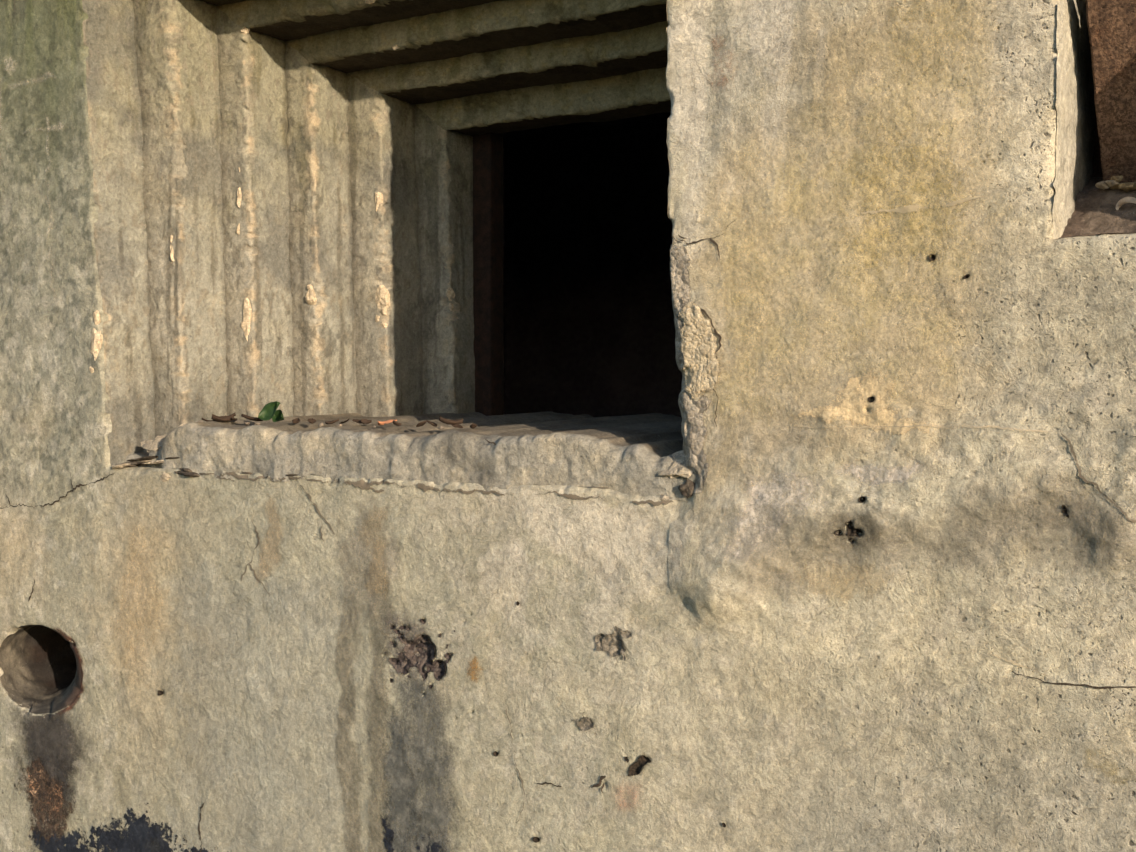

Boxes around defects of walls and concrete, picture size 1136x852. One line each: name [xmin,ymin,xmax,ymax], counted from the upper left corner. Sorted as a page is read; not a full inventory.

spalling [670,237,721,495]
peeling [858,373,894,413]
crack [1,467,125,509]
crack [1060,430,1136,522]
spalling [834,520,863,544]
damp [335,517,455,852]
spalling [384,613,455,689]
spalling [595,626,632,661]
spalling [624,750,651,776]
rust [14,759,76,849]